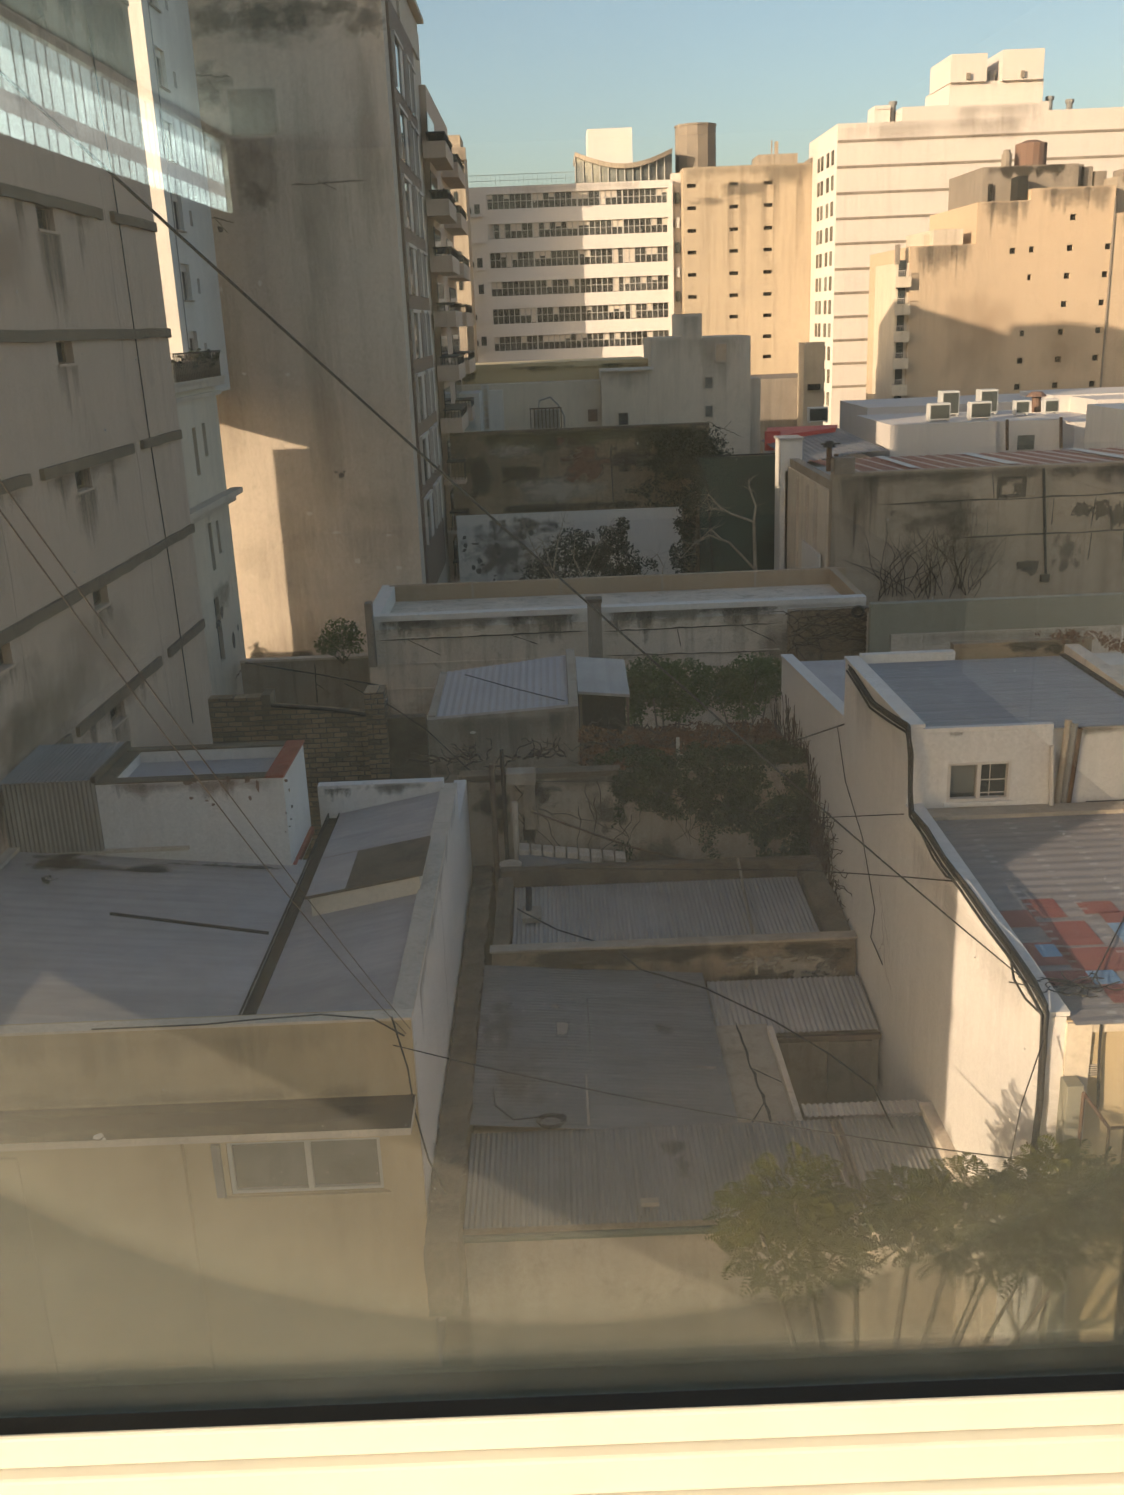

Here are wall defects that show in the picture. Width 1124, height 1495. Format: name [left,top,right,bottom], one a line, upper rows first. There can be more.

damp [478,501,637,573]
damp [1017,561,1038,576]